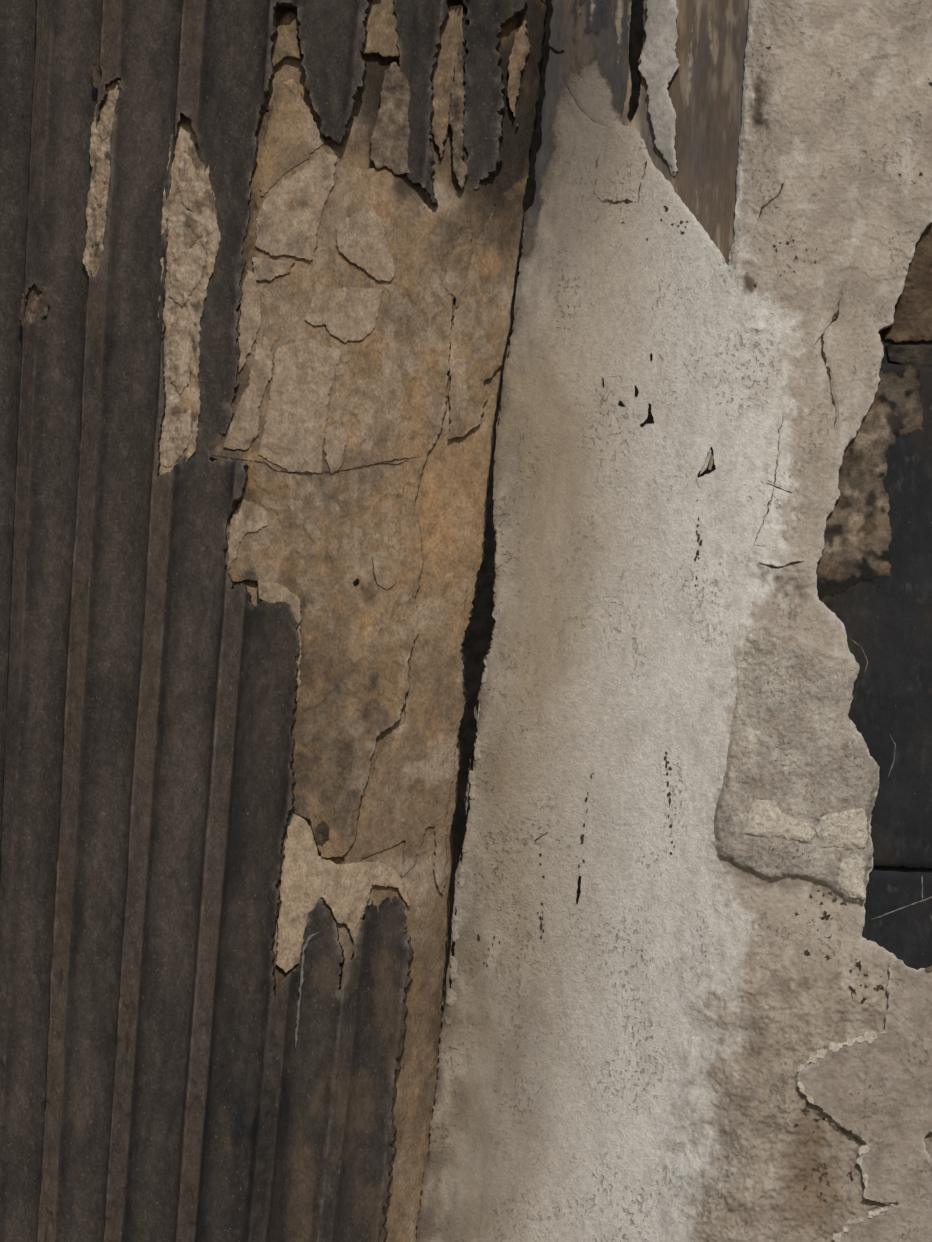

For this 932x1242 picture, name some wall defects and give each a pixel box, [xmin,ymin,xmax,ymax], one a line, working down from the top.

spalling [19,285,51,327]
spalling [83,59,127,277]
peeling [621,0,749,265]
spalling [885,224,932,343]
spalling [816,365,923,608]
spalling [158,0,548,1242]